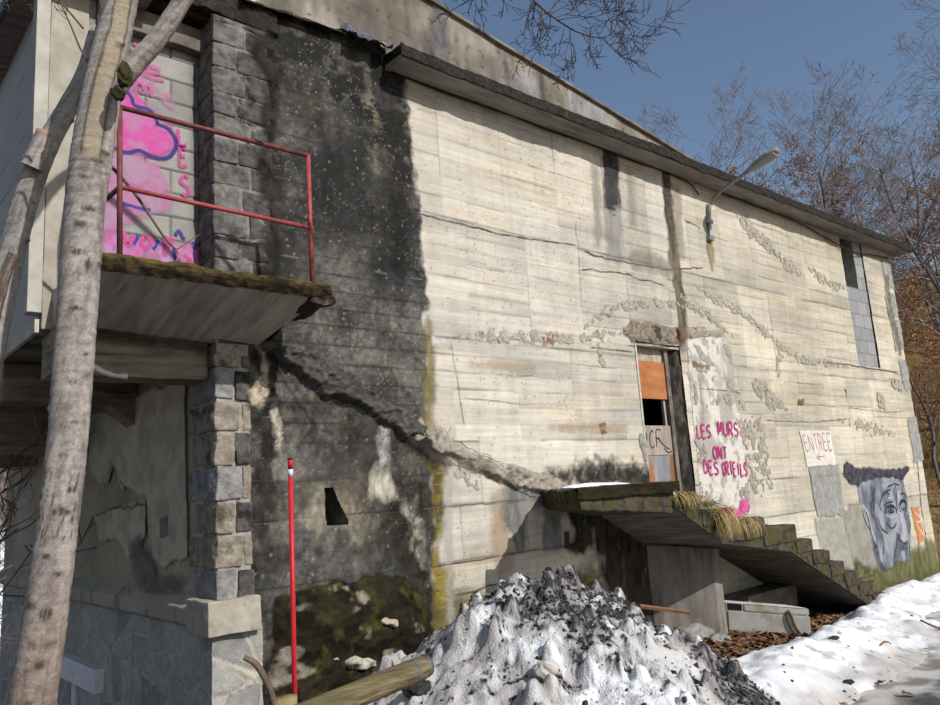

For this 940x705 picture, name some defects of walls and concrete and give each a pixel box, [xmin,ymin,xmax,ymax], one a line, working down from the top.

crack [419,213,703,290]
water stain [593,150,687,328]
peeling [88,385,187,568]
water stain [96,0,454,705]
crack [426,342,543,509]
peeling [685,326,733,408]
peeling [740,482,750,510]